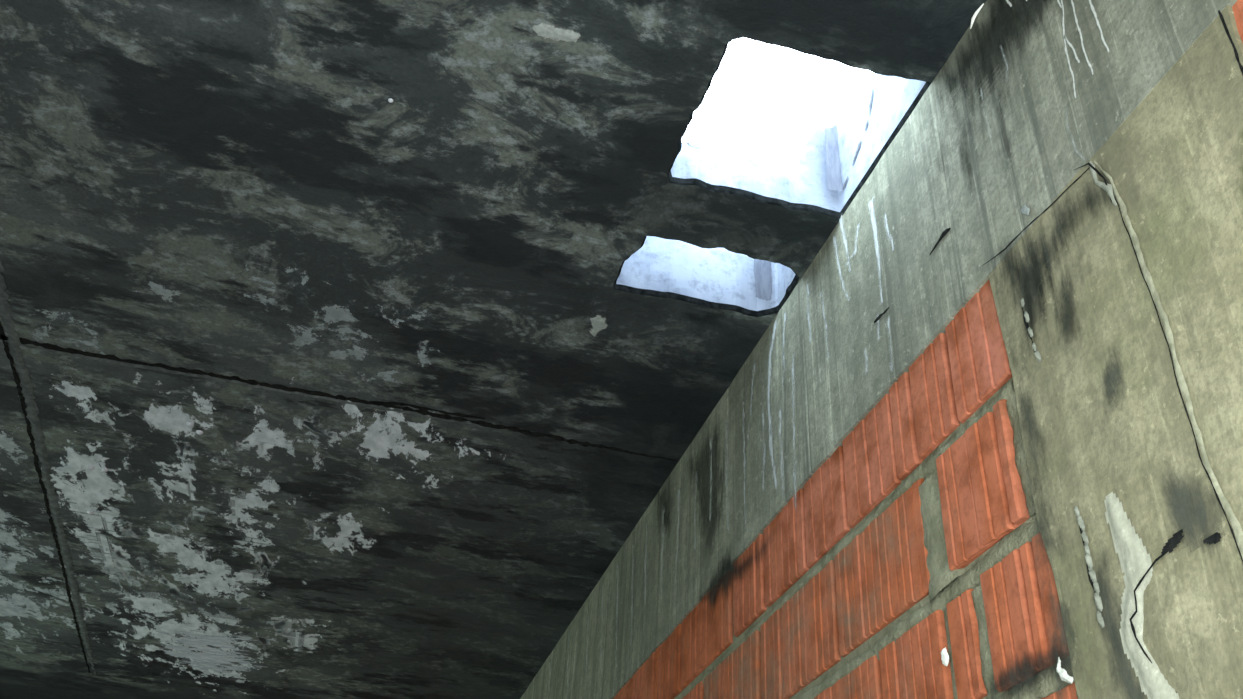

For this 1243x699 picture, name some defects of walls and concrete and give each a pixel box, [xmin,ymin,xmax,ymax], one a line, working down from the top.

water stain [946,0,1093,99]
water stain [1089,0,1109,52]
peeling [0,363,501,694]
crack [0,259,676,674]
water stain [1021,397,1041,467]
crack [982,161,1243,562]
water stain [1105,362,1122,403]
water stain [1168,482,1208,542]